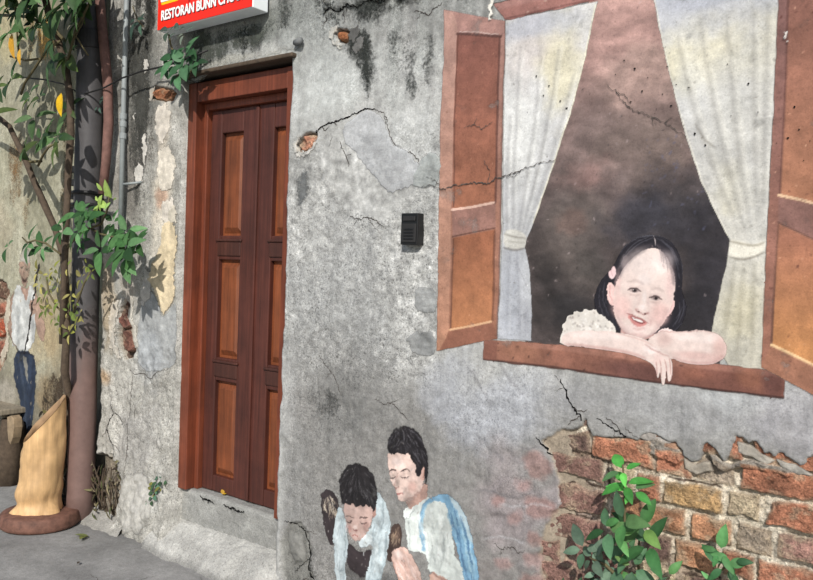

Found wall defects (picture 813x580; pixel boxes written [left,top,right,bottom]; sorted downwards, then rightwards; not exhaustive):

spalling [329,25,364,54]
crack [322,0,385,26]
leakage [315,0,406,25]
leakage [347,29,375,97]
leakage [405,36,432,97]
leakage [128,0,156,202]
spalling [292,134,318,158]
crack [316,108,419,167]
peeling [108,86,177,360]
crack [556,376,638,438]
spalling [542,420,813,580]
crack [285,520,317,580]